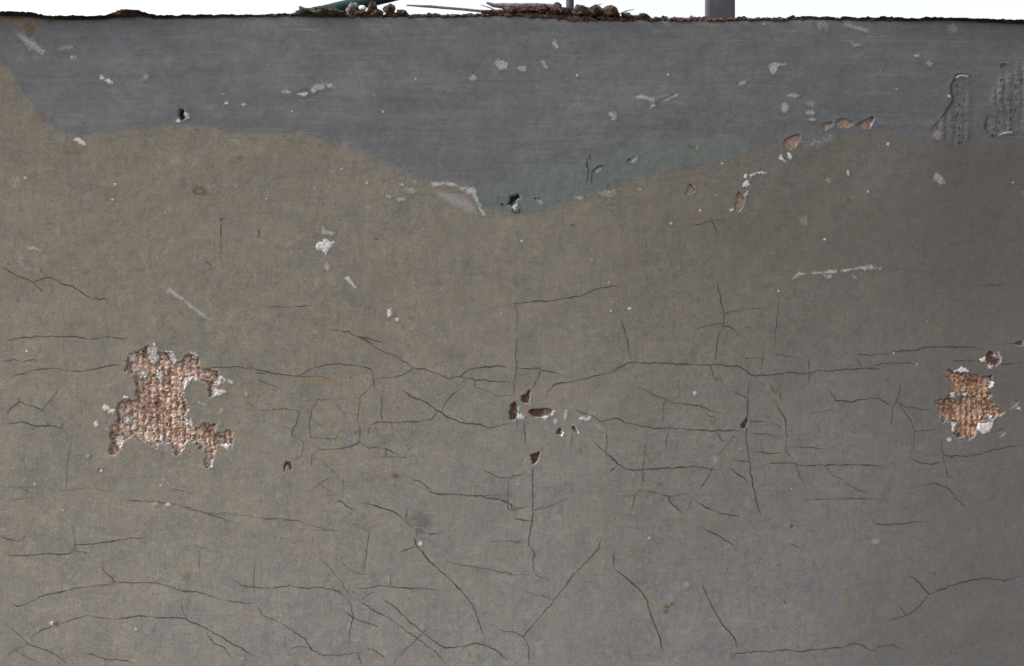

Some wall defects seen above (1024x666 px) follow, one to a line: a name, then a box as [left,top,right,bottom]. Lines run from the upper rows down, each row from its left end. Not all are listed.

peeling [778,135,799,164]
peeling [728,168,768,213]
crack [2,267,109,305]
spalling [100,342,234,470]
peeling [509,391,530,421]
spalling [934,351,1022,439]
peeling [557,423,581,438]
crack [2,278,1023,666]